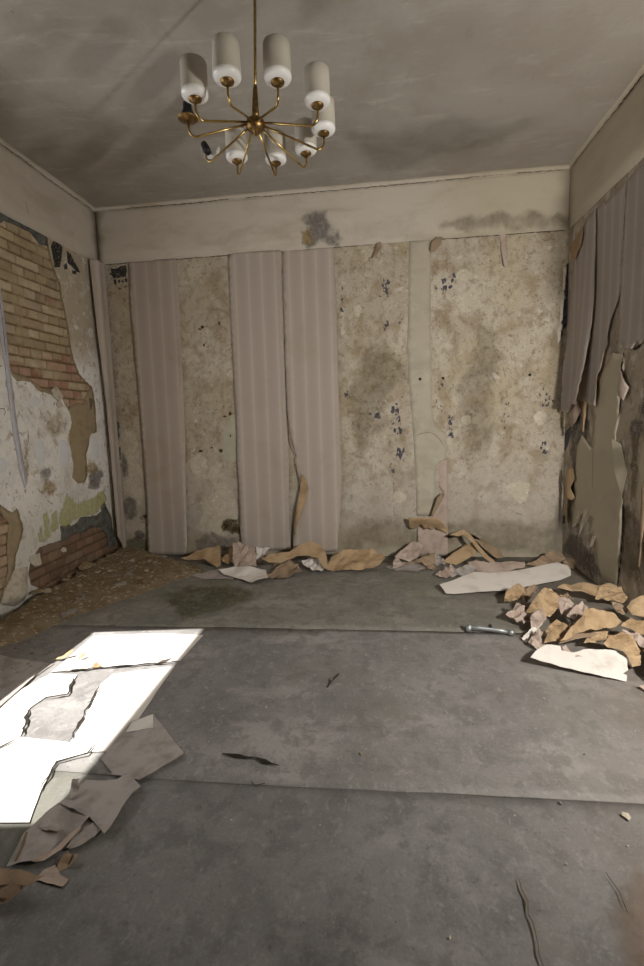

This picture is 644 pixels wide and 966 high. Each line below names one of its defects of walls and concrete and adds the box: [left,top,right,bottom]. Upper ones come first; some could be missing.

crack [126,74,644,209]
damp [303,214,338,246]
peeling [109,265,128,289]
spalling [435,269,472,291]
peeling [557,263,569,345]
spalling [0,213,96,483]
peeling [369,403,403,434]
spalling [436,380,471,438]
spalling [190,447,241,545]
peeling [563,352,627,585]
spalling [0,506,22,600]
spalling [28,503,118,589]